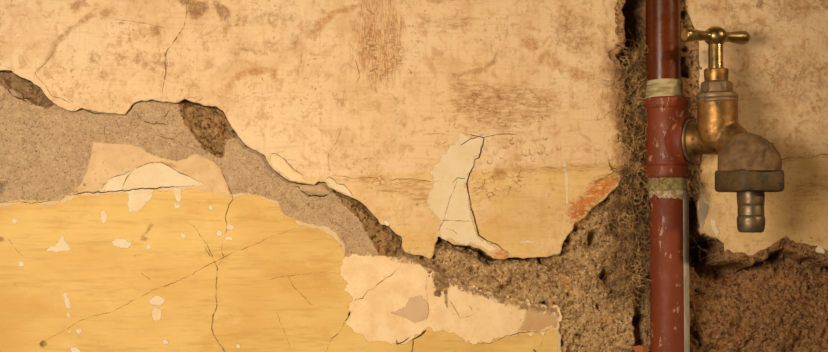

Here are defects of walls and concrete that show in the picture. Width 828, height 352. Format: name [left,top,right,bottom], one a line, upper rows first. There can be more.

crack [0,58,106,137]
crack [1,162,187,204]
crack [184,221,265,352]
crack [116,1,426,245]
spalling [0,0,650,352]
crack [437,91,548,262]
rust [571,177,619,220]
spalling [681,0,702,121]
spalling [688,156,828,352]